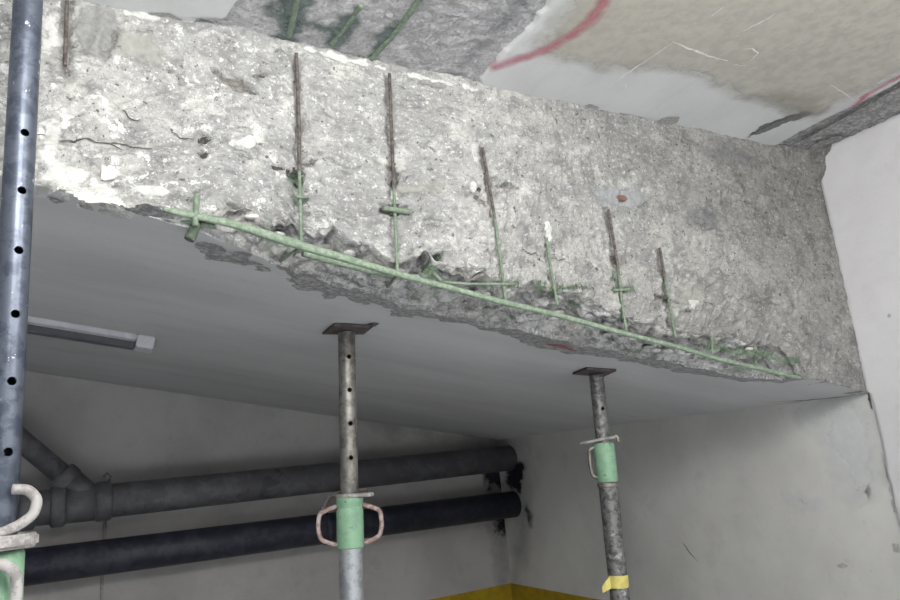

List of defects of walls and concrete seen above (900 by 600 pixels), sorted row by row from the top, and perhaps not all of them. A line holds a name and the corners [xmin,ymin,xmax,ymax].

peeling [123,10,182,21]
peeling [41,10,82,61]
spalling [97,26,121,63]
spalling [195,0,547,95]
crack [37,134,152,150]
peeling [747,111,813,138]
spalling [813,143,833,182]
spalling [35,118,806,383]
water stain [484,463,524,493]